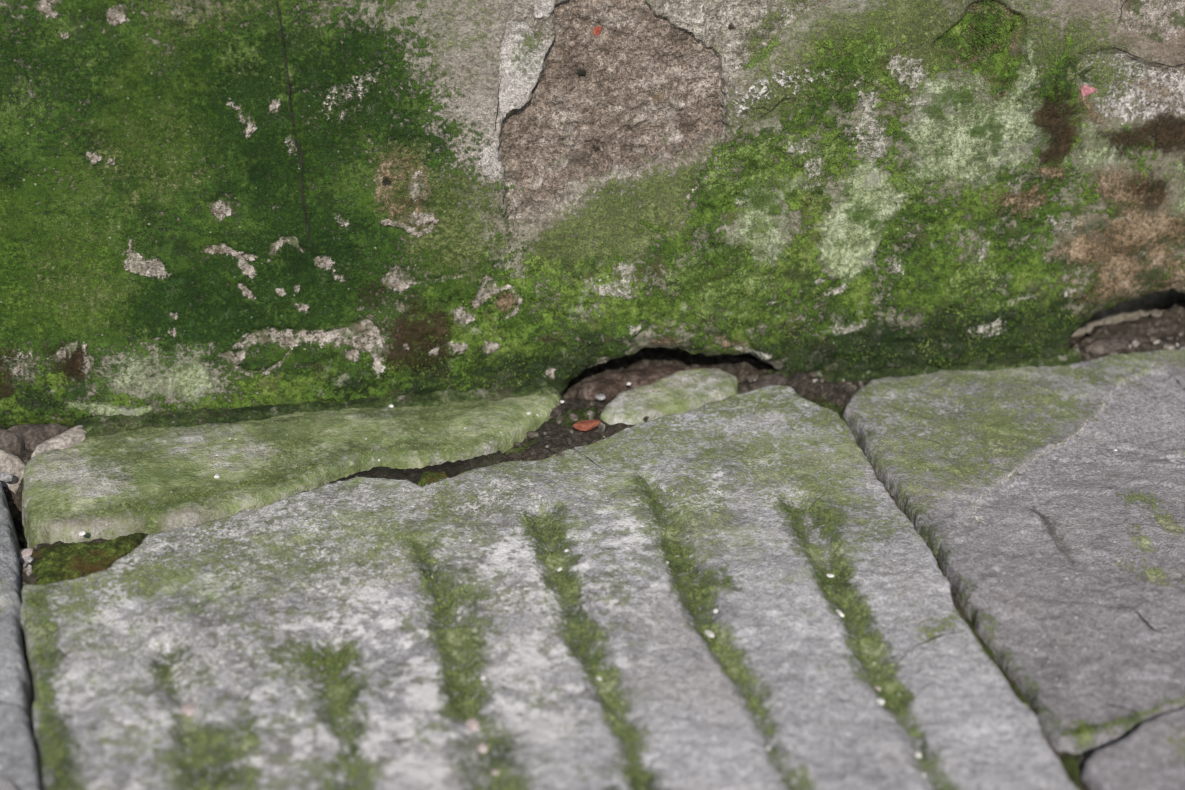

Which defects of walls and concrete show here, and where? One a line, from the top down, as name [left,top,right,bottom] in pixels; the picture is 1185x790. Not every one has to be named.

spalling [478,0,833,252]
crack [1101,47,1185,67]